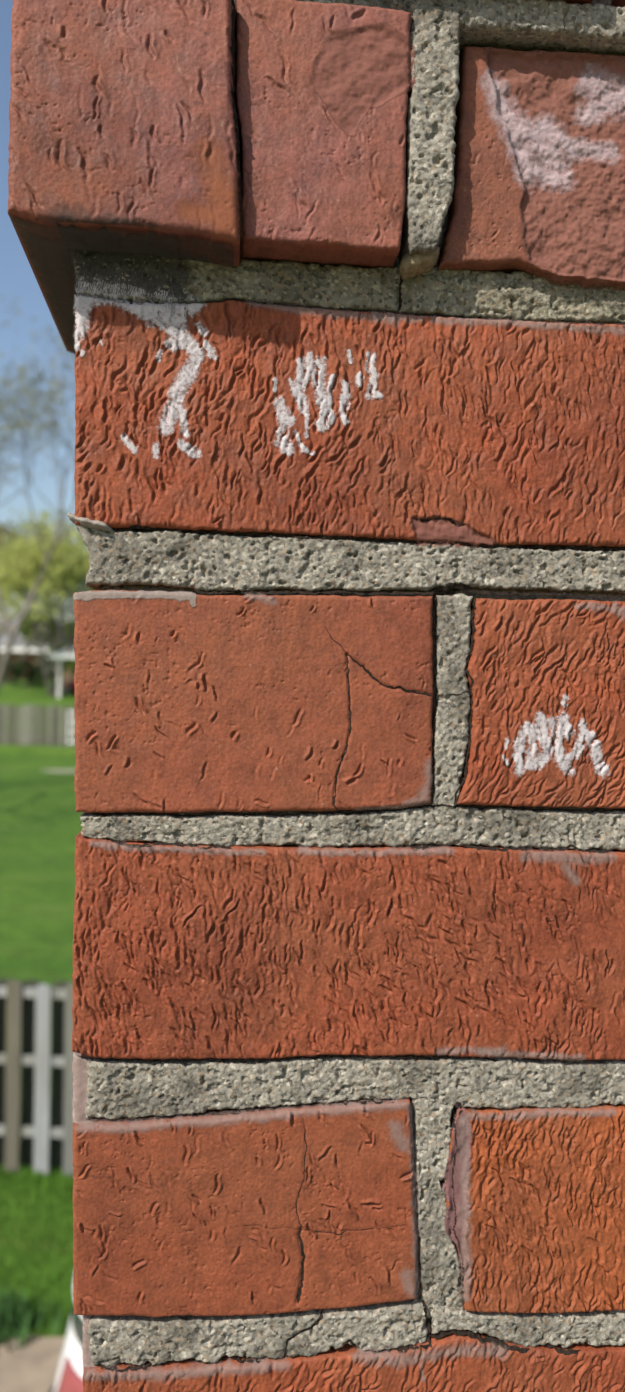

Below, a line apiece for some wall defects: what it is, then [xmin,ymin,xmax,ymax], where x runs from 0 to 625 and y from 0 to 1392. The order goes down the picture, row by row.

crack [112,517,625,552]
spalling [411,516,495,547]
crack [99,582,625,850]
crack [409,842,611,854]
crack [78,1055,499,1063]
crack [94,1098,402,1372]
crack [346,1127,580,1355]